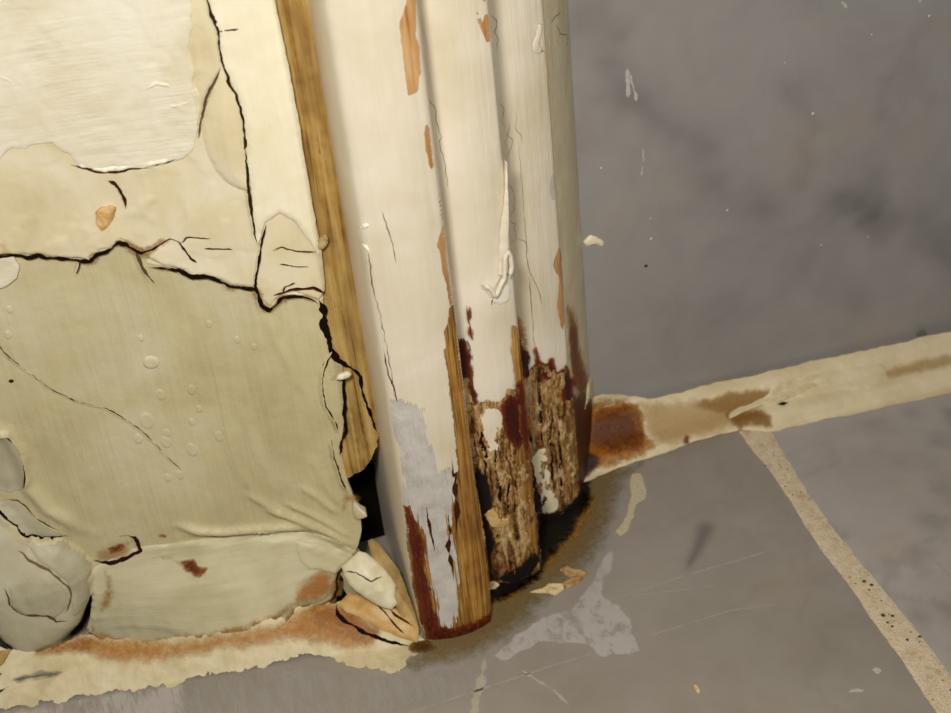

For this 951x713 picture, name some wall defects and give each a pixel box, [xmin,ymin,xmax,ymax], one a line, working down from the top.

peeling [74,159,177,173]
crack [0,0,377,493]
crack [368,254,397,401]
rust [458,307,479,405]
rust [501,308,655,494]
crack [0,430,68,546]
rust [39,570,379,661]
peeling [341,459,491,653]
leakage [406,468,631,669]